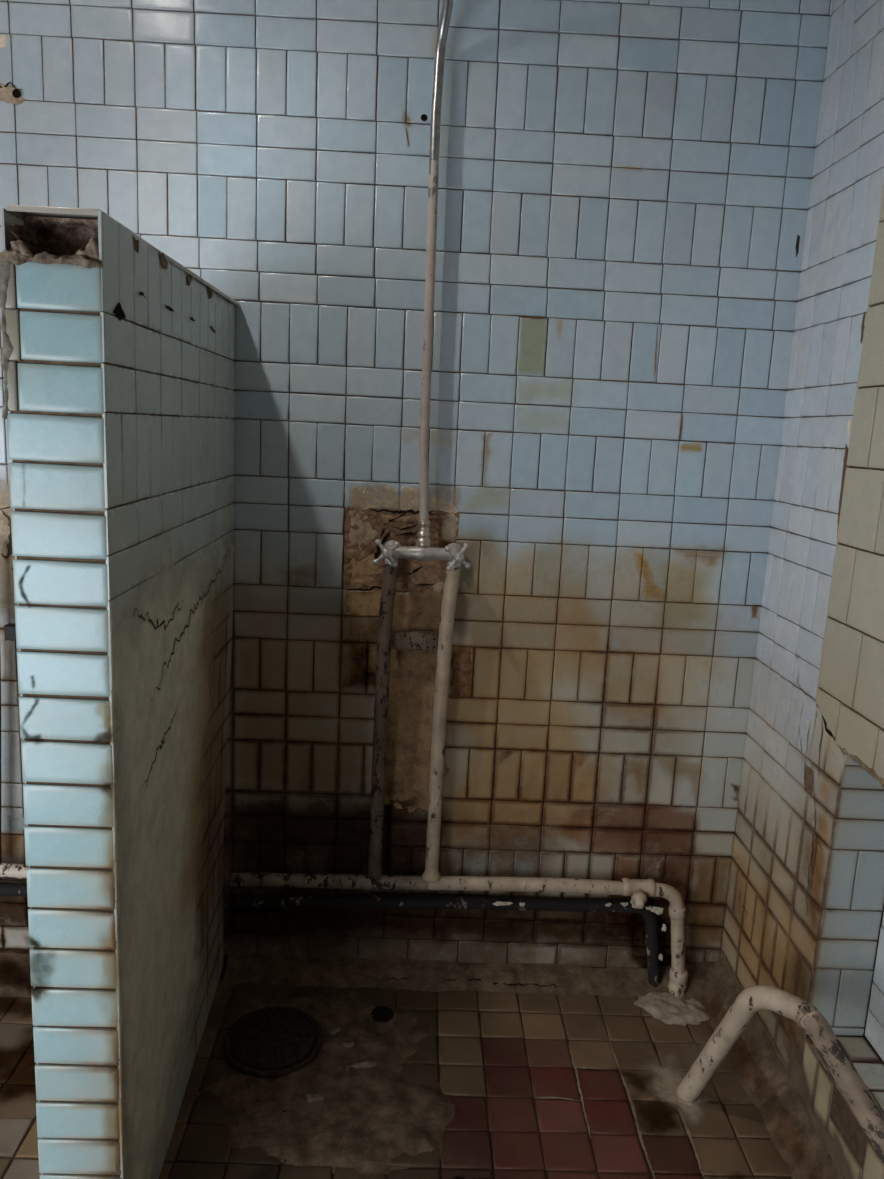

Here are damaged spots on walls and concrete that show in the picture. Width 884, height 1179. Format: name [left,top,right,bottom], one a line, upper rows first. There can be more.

spalling [0,82,24,106]
flaking render [0,216,103,420]
flaking render [343,485,460,594]